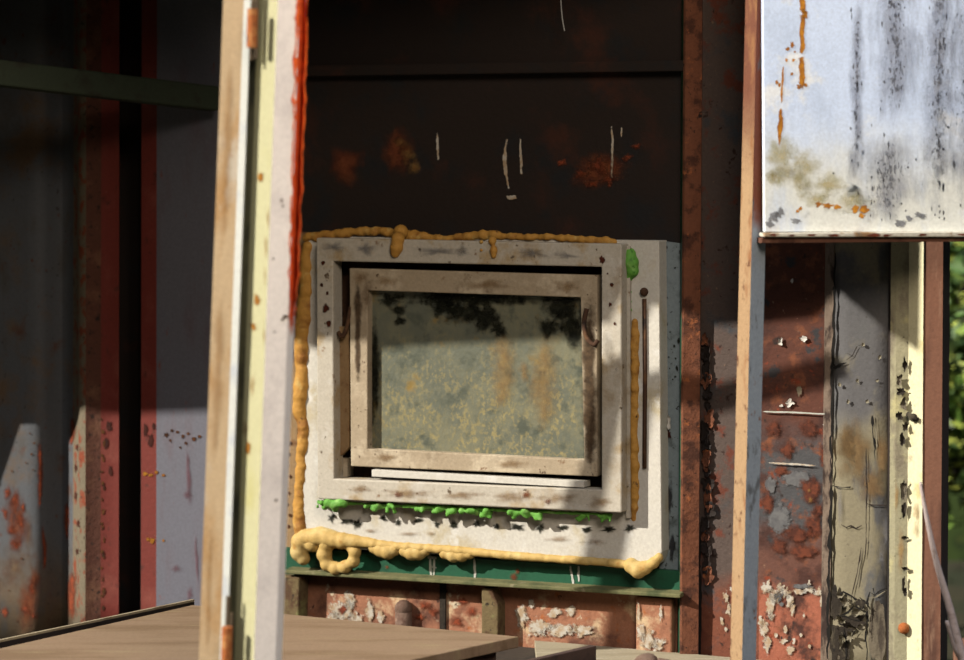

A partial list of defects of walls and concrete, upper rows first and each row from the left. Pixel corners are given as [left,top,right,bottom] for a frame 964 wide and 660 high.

rust [775,0,807,145]
water stain [850,8,864,166]
water stain [881,0,906,94]
water stain [929,0,964,190]
rust [288,0,307,331]
water stain [870,133,917,220]
peeling [896,357,908,446]
rust [772,477,823,560]
rust [68,574,76,615]
peeling [328,590,385,623]
peeling [515,599,594,638]
spalling [758,580,869,660]